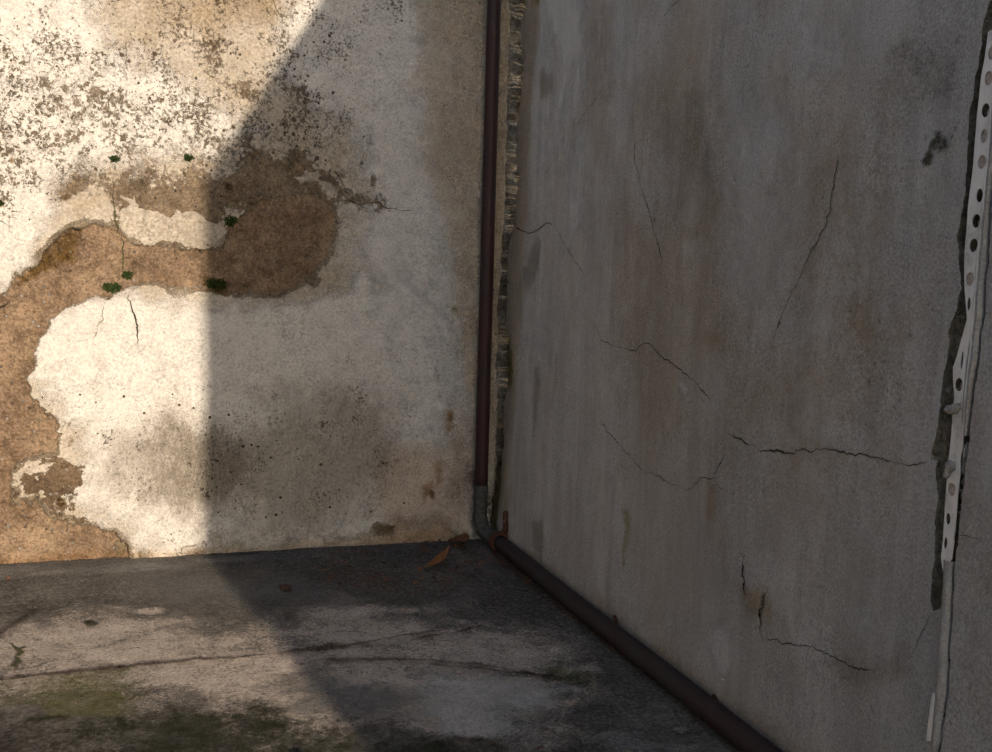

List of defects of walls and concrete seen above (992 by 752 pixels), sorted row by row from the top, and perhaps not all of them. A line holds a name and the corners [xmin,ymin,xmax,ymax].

crack [335,171,410,211]
crack [774,128,844,336]
peeling [0,0,410,564]
leakage [0,0,486,574]
crack [593,323,710,399]
crack [600,419,926,491]
crack [764,638,874,671]